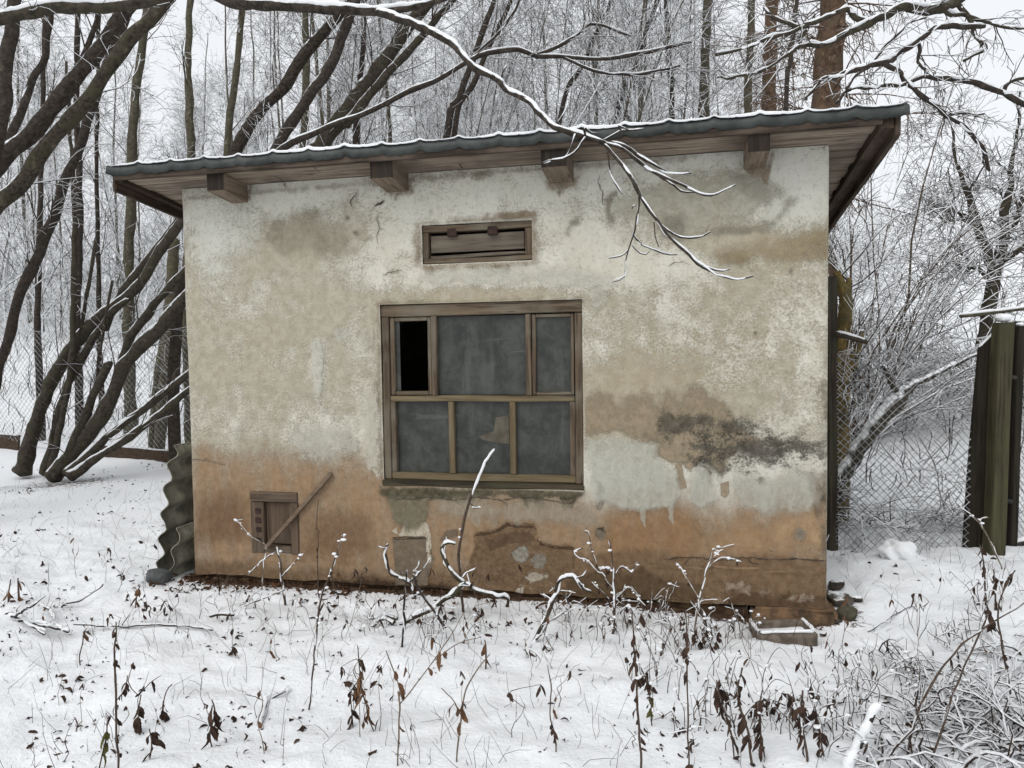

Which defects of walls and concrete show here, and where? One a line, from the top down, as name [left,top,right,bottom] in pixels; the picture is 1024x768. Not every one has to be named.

water stain [657,413,824,473]
peeling [392,522,458,563]
spalling [469,522,575,593]